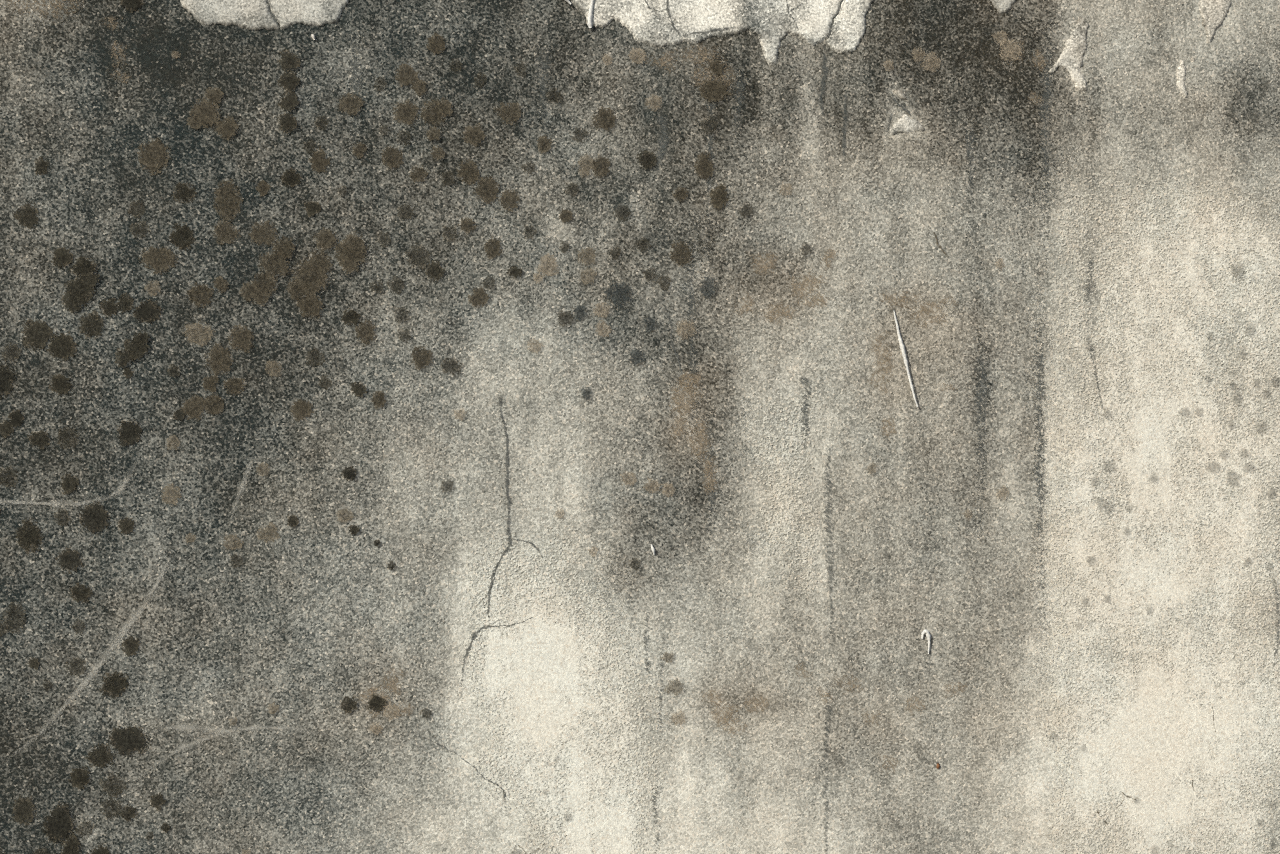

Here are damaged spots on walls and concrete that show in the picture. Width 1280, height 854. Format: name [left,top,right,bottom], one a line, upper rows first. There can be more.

peeling [180,0,348,40]
peeling [571,0,873,66]
leakage [186,49,522,318]
leakage [604,50,757,388]
leakage [0,247,161,449]
leakage [368,277,462,376]
leakage [54,473,134,534]
crack [461,399,540,681]
leakage [751,378,834,624]
leakage [12,726,170,854]
leakage [341,694,386,714]
leakage [458,524,668,854]